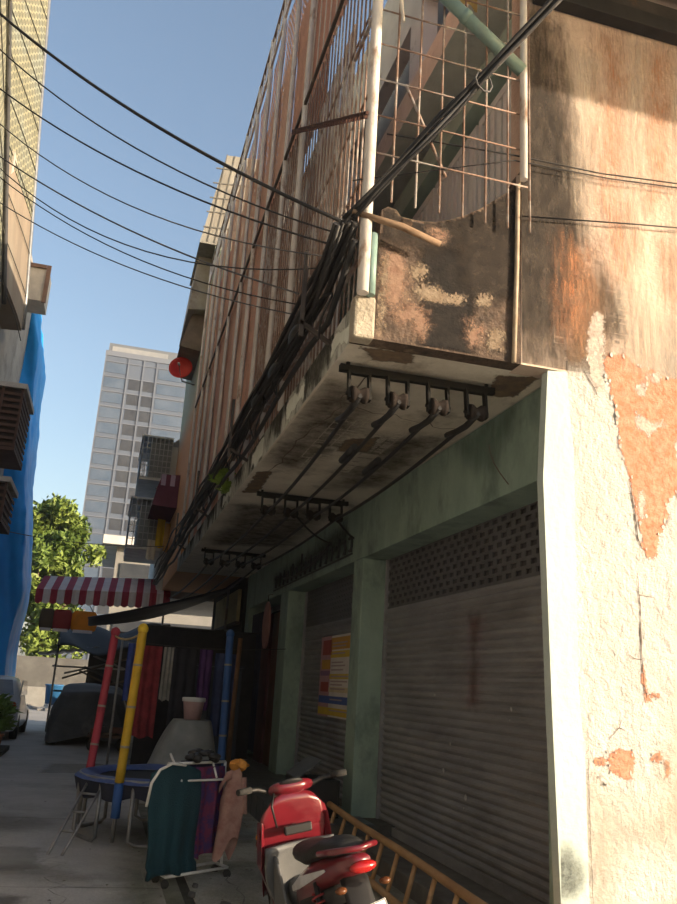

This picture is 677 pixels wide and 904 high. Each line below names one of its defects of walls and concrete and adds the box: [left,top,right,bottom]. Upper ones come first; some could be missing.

leakage [380,5,677,378]
peeling [601,352,677,559]
crack [630,574,658,698]
peeling [594,748,635,780]
peeling [650,750,671,780]